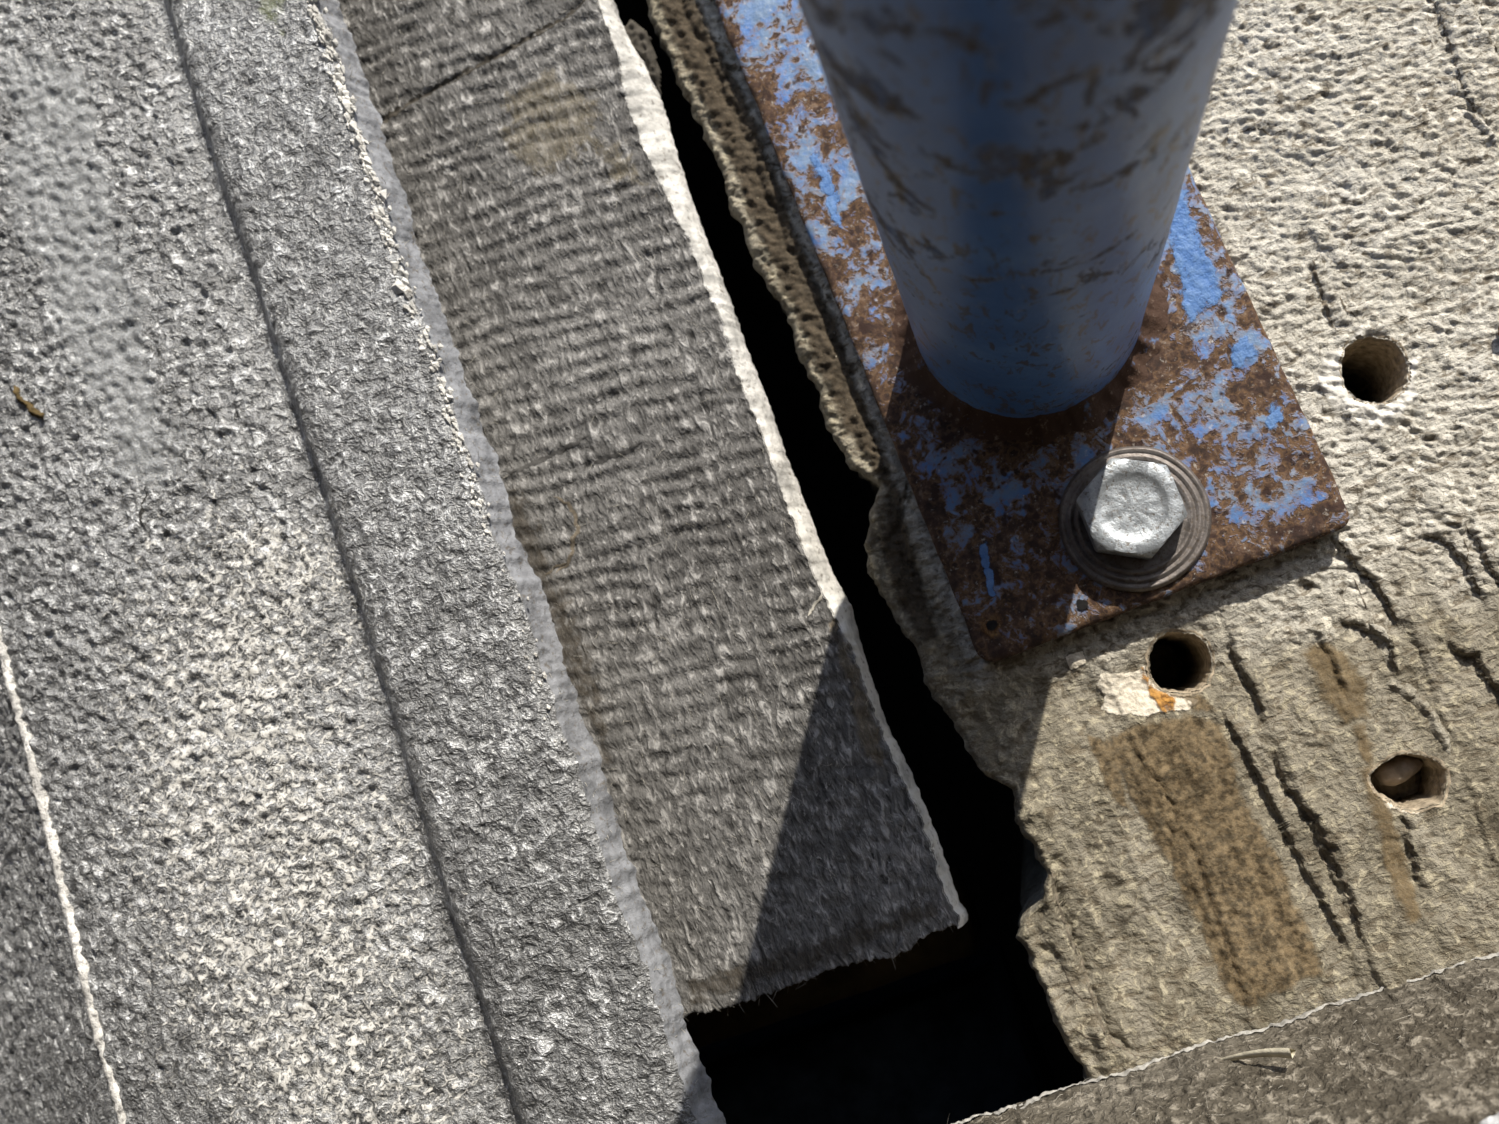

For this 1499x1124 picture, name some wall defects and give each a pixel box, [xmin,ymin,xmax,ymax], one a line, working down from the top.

crack [1430,0,1499,133]
crack [1420,523,1499,603]
crack [1321,538,1399,673]
spalling [1066,651,1086,670]
spalling [1097,666,1193,717]
crack [1446,632,1499,693]
crack [1218,643,1361,953]
leakage [1089,695,1321,1005]
crack [1401,816,1420,887]